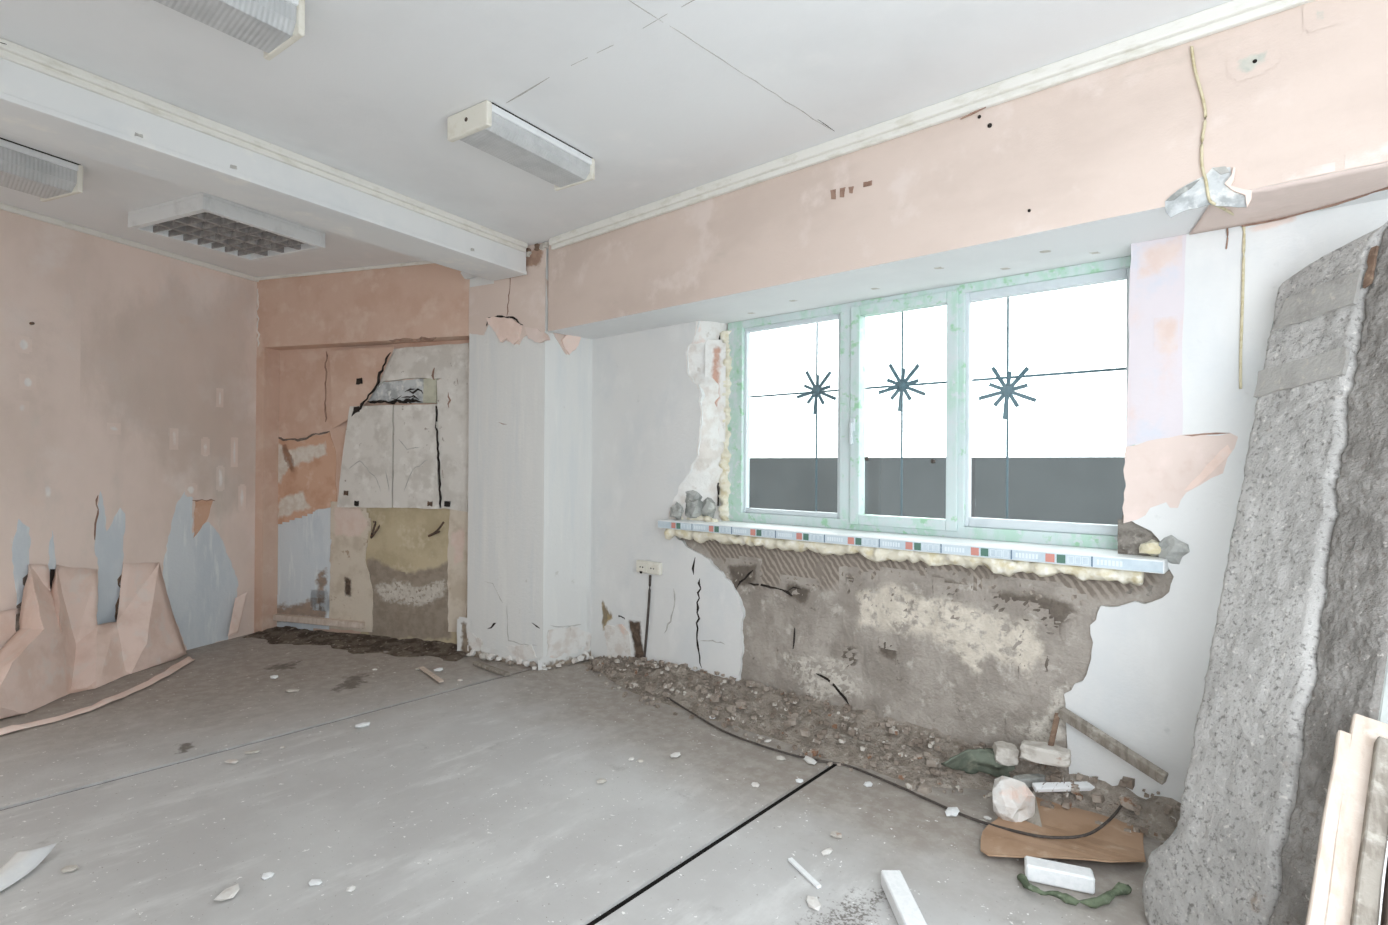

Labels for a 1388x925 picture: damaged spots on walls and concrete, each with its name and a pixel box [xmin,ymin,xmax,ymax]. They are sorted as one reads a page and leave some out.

spalling [1165,166,1252,218]
peeling [278,437,331,524]
spalling [366,508,450,563]
spalling [669,321,728,520]
spalling [681,515,1190,694]
spalling [865,645,1071,827]